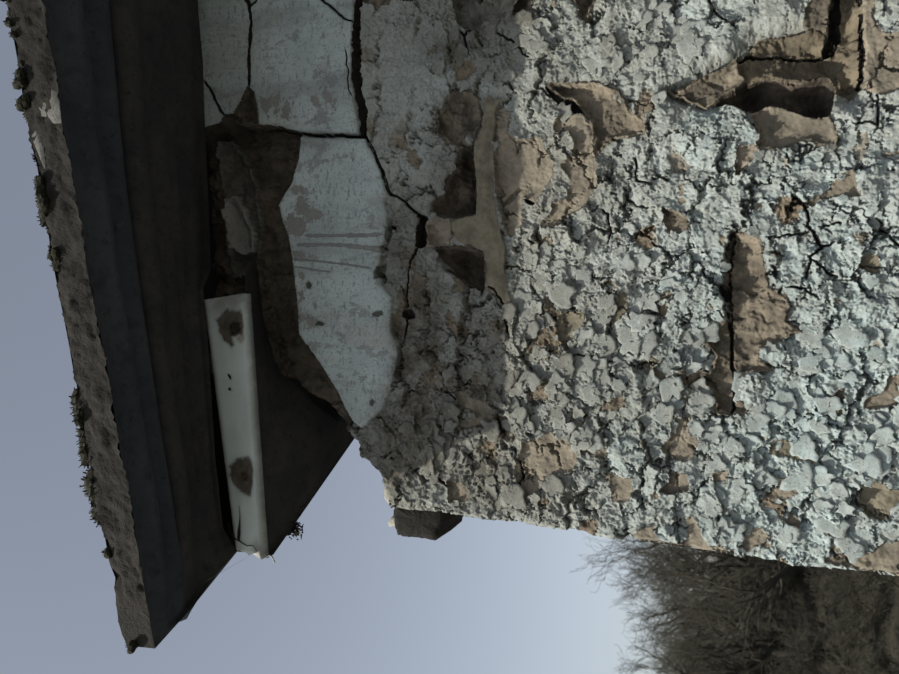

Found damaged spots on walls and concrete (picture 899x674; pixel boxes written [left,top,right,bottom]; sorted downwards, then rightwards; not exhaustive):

crack [244,0,257,86]
spalling [572,0,595,24]
crack [709,0,736,29]
crack [738,0,882,129]
peeling [803,0,834,34]
peeling [858,0,899,94]
crack [268,0,425,343]
rust [216,309,243,346]
spalling [205,86,354,432]
peeling [398,32,899,576]
crack [719,233,736,413]
rust [229,457,253,496]